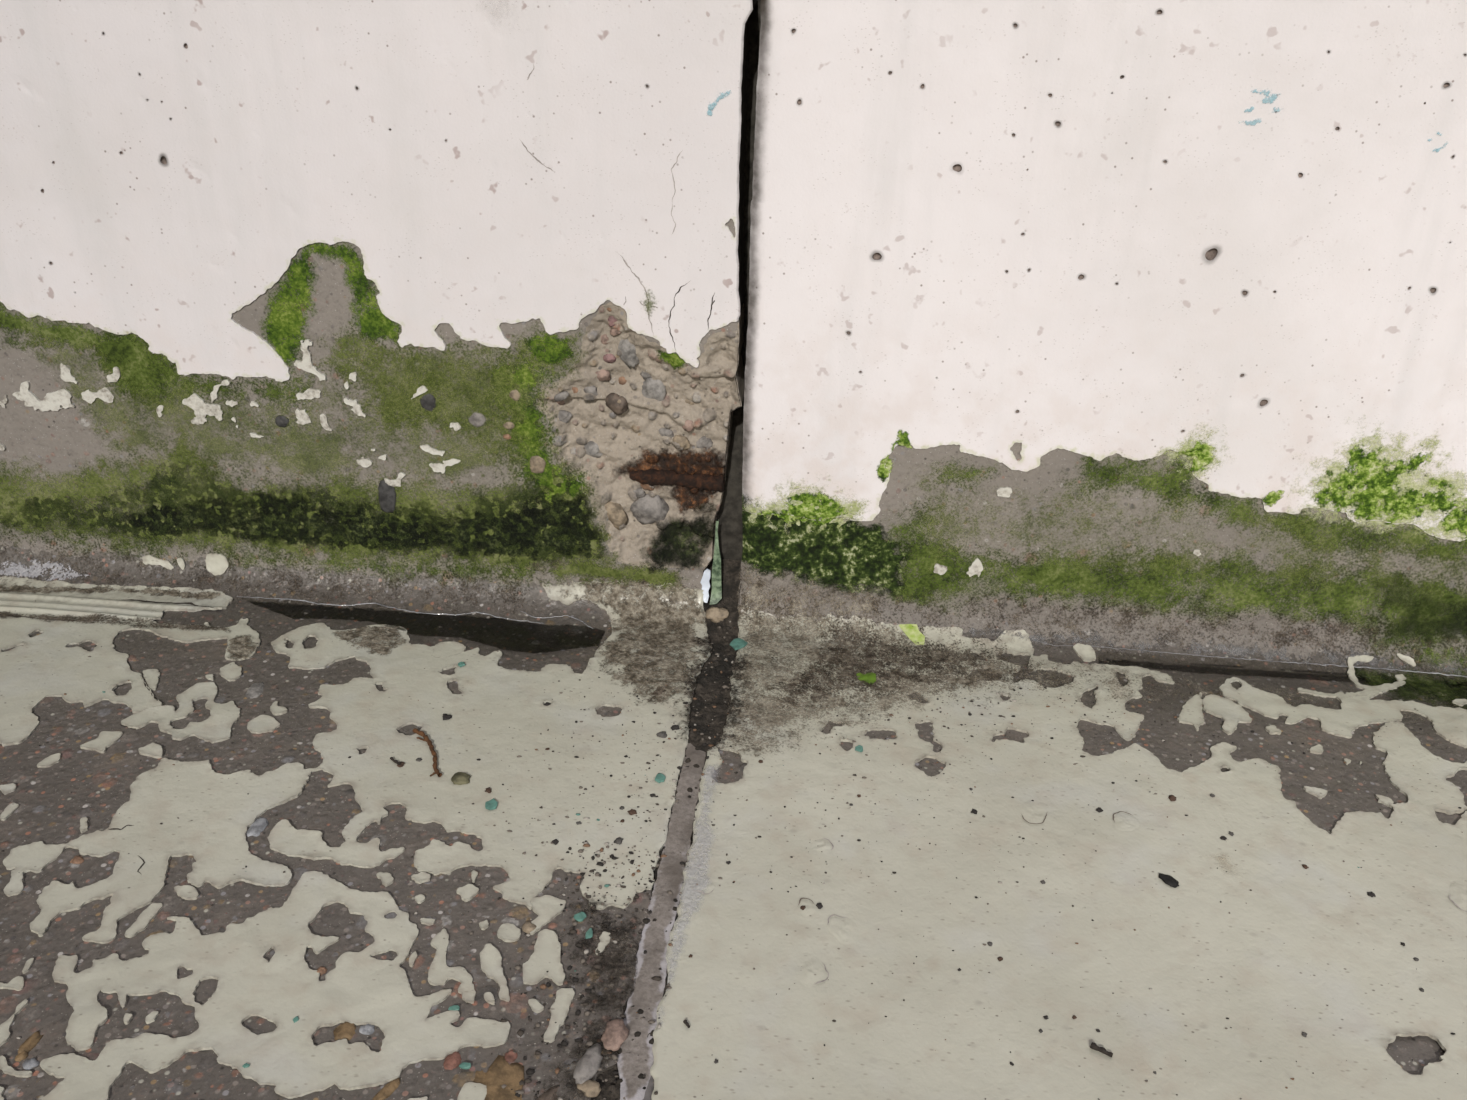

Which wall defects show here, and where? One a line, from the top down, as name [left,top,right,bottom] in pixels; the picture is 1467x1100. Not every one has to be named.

peeling [0,241,747,1100]
rust [618,450,726,513]
peeling [738,442,1467,834]